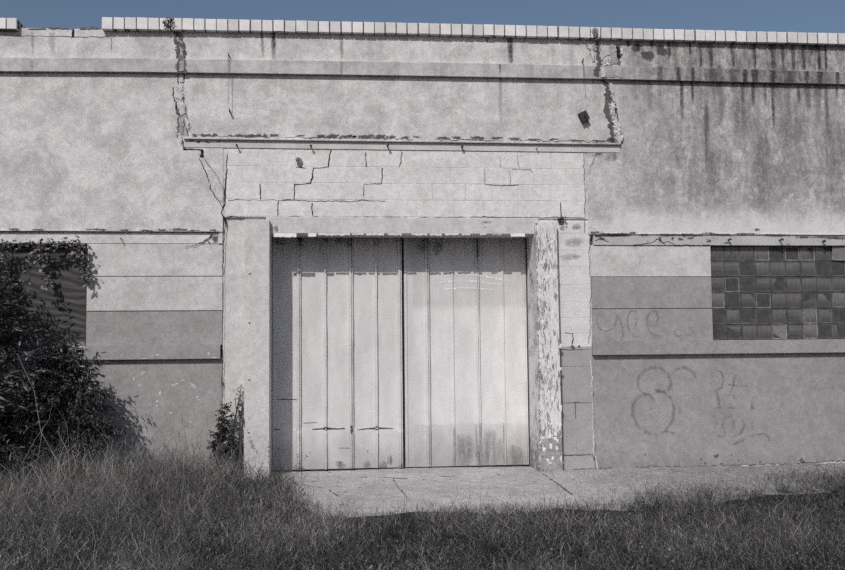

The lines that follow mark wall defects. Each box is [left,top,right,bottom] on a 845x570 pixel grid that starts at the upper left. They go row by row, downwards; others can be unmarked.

water stain [616,41,670,62]
water stain [676,42,717,108]
water stain [730,43,839,120]
crack [172,31,402,312]
crack [402,41,624,469]
crack [218,332,226,396]
peeling [535,222,612,472]